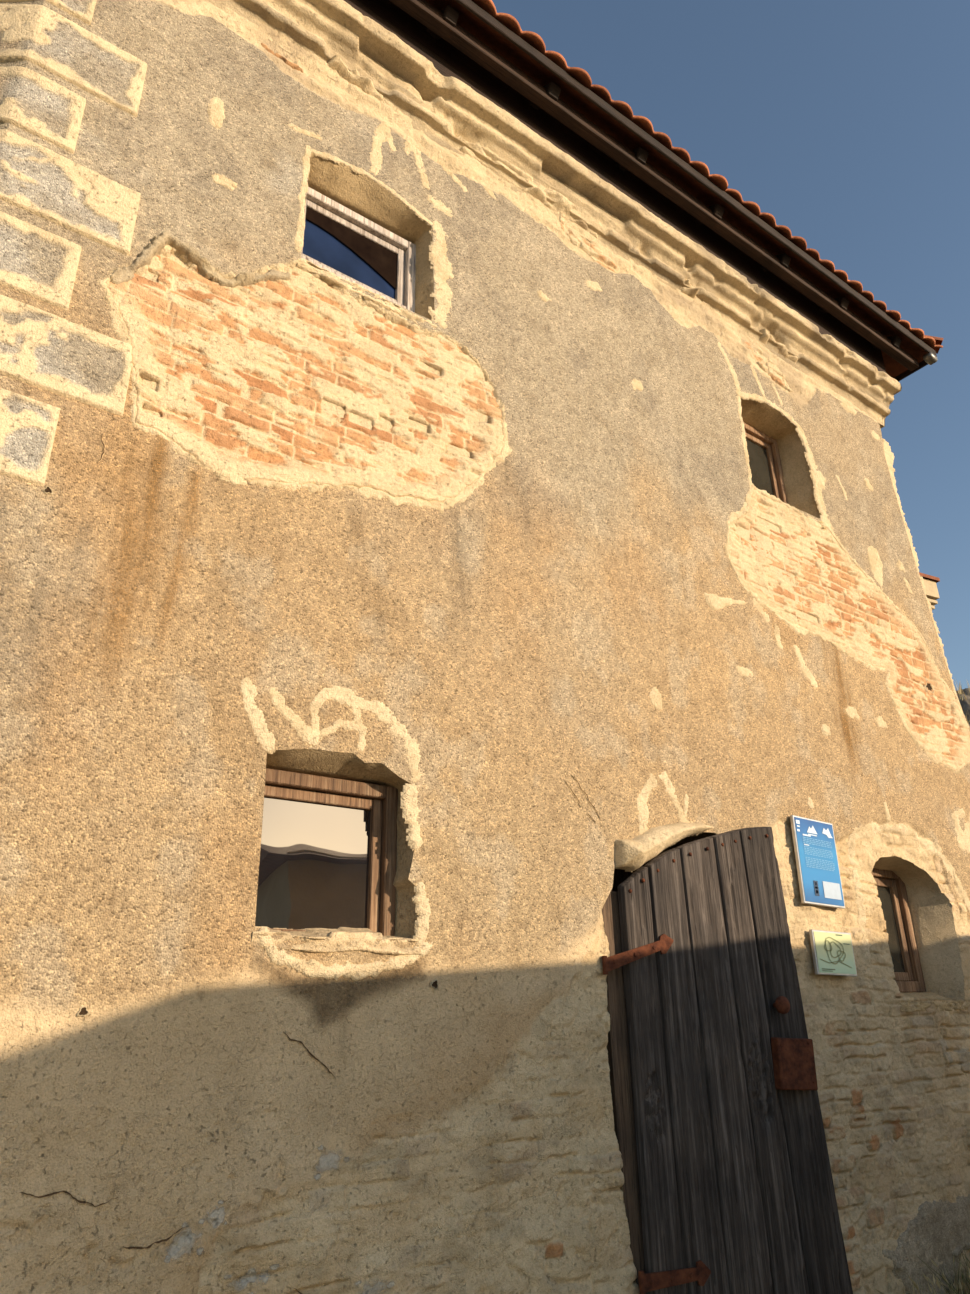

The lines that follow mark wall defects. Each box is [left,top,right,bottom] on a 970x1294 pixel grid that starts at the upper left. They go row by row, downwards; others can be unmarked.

spalling [559,216,617,273]
flaking render [586,280,602,292]
spalling [98,145,512,514]
spalling [744,342,793,392]
spalling [704,390,970,774]
spalling [257,882,433,981]
crack [283,1032,335,1078]
crack [21,1190,118,1207]
crack [123,1226,187,1250]